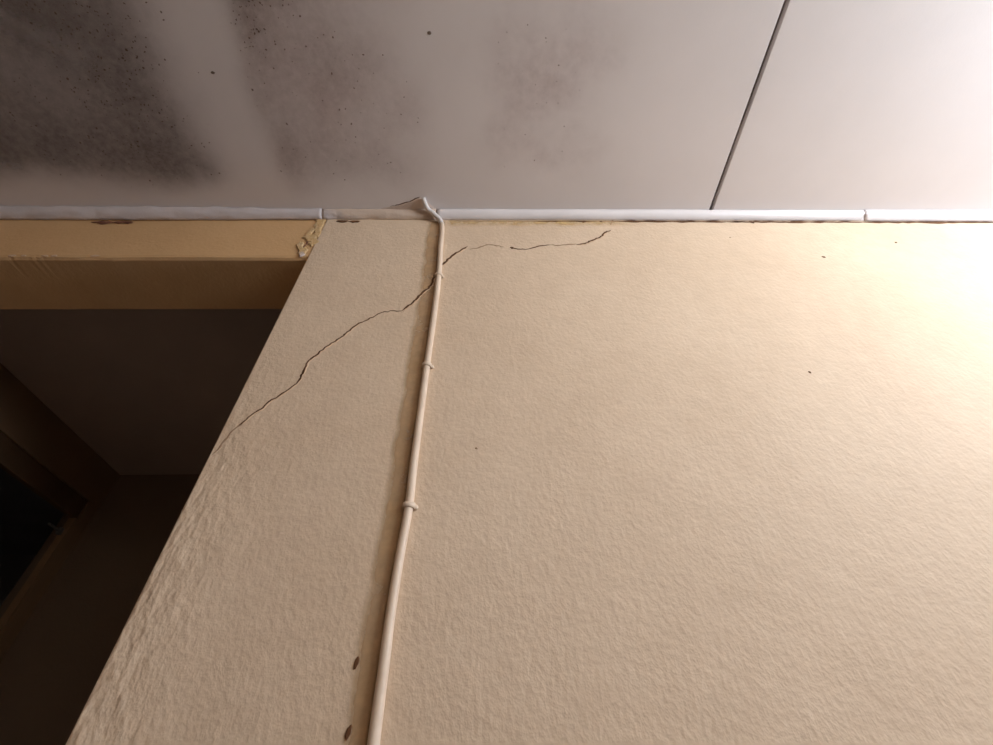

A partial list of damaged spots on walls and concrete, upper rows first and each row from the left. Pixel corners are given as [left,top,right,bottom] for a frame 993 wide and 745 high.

water stain [0,0,210,181]
crack [212,212,993,691]